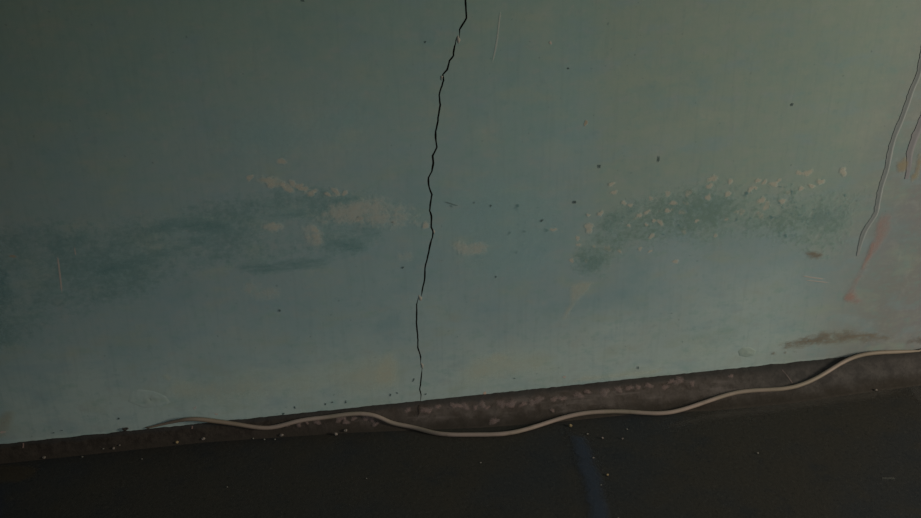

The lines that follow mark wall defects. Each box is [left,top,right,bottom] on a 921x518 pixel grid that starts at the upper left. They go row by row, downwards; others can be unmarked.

crack [416,0,467,417]